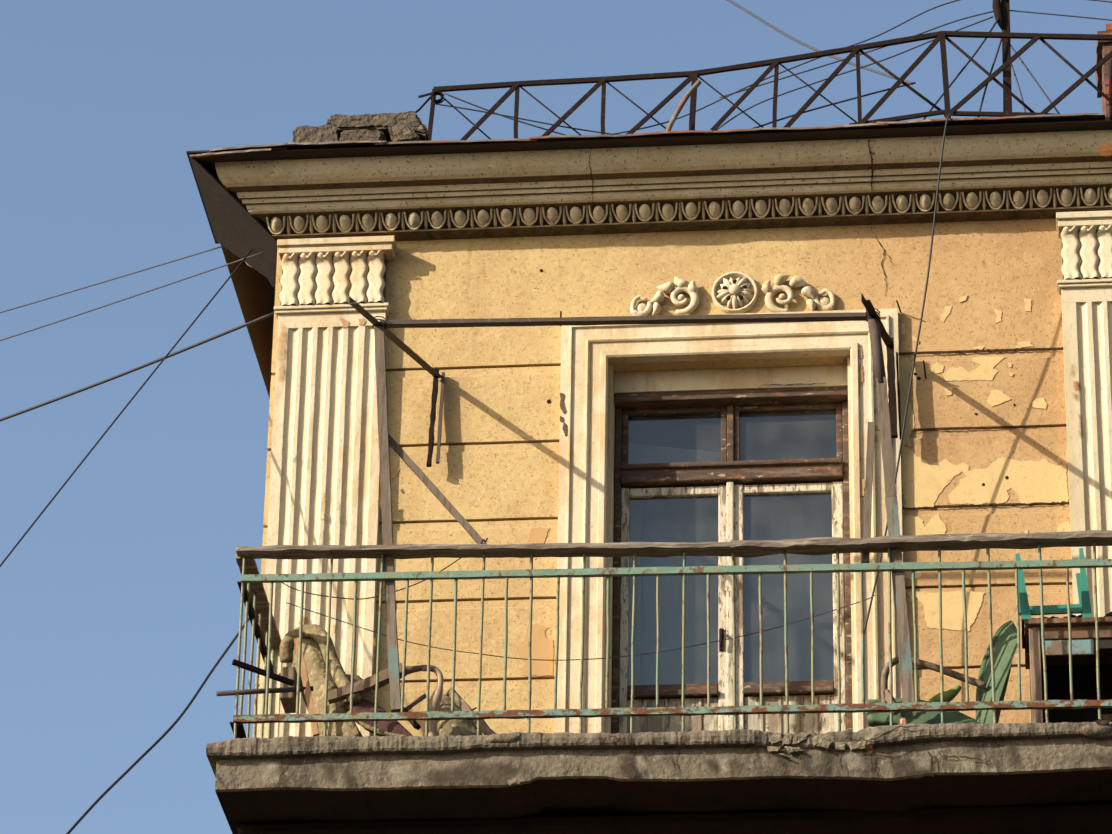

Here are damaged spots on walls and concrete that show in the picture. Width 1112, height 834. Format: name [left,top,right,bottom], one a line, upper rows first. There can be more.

crack [864,138,873,191]
crack [871,228,893,296]
peeling [932,346,1015,407]
peeling [899,357,1070,536]
spalling [767,732,866,759]